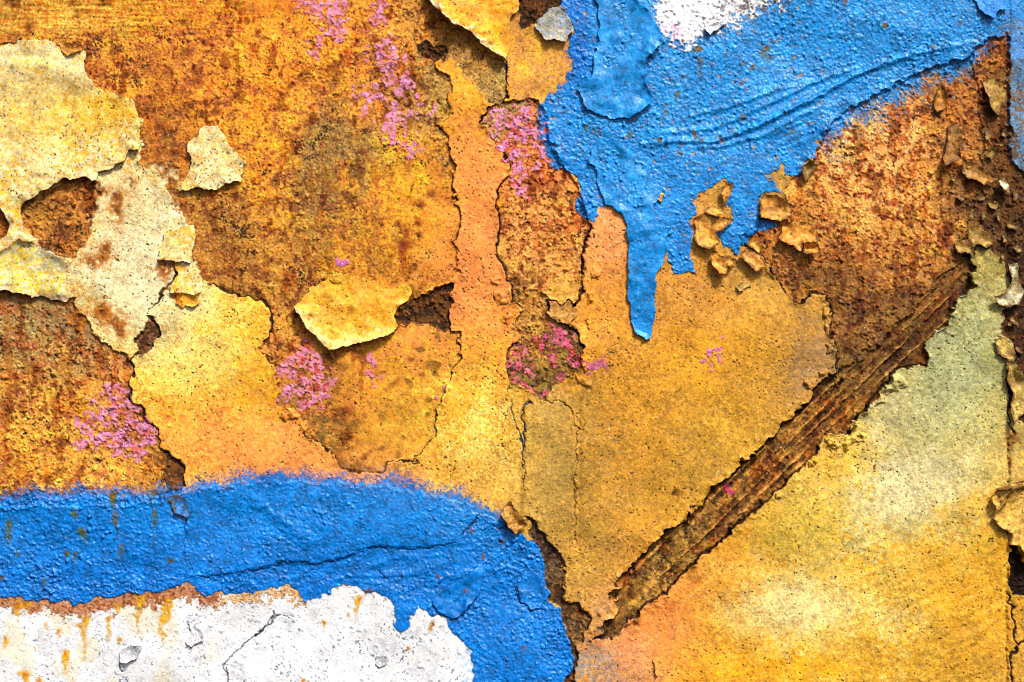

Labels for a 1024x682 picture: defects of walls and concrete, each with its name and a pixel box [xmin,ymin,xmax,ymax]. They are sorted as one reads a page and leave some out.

peeling [704,21,727,35]
peeling [975,0,1007,18]
peeling [577,0,663,119]
rust [156,261,177,282]
spalling [0,0,594,518]
rust [394,221,422,269]
rust [67,302,126,337]
spalling [501,32,1024,682]
crack [510,401,532,491]
peeling [119,645,142,663]
crack [223,611,285,672]
peeling [376,654,388,668]